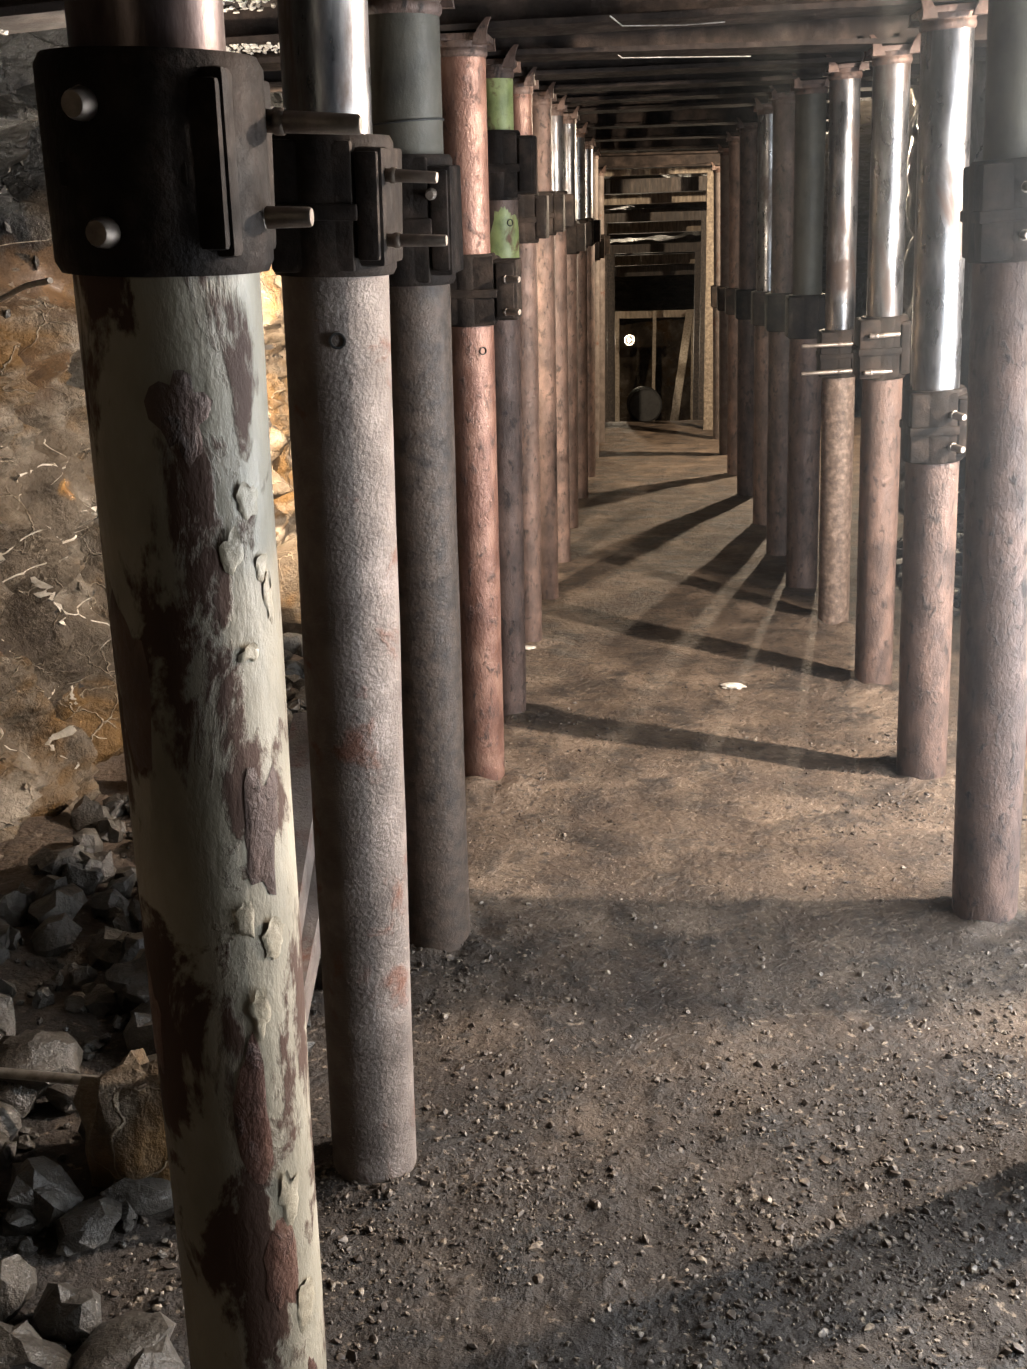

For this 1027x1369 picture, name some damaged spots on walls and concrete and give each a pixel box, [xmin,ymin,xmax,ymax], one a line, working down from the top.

rust [144,370,213,468]
peeling [219,482,274,625]
rust [110,590,152,773]
peeling [238,642,259,663]
rust [244,764,278,895]
peeling [234,901,285,960]
peeling [248,987,271,1042]
rust [233,1031,274,1184]
peeling [278,1170,299,1226]
rust [264,1217,299,1310]
peeling [296,1276,314,1335]